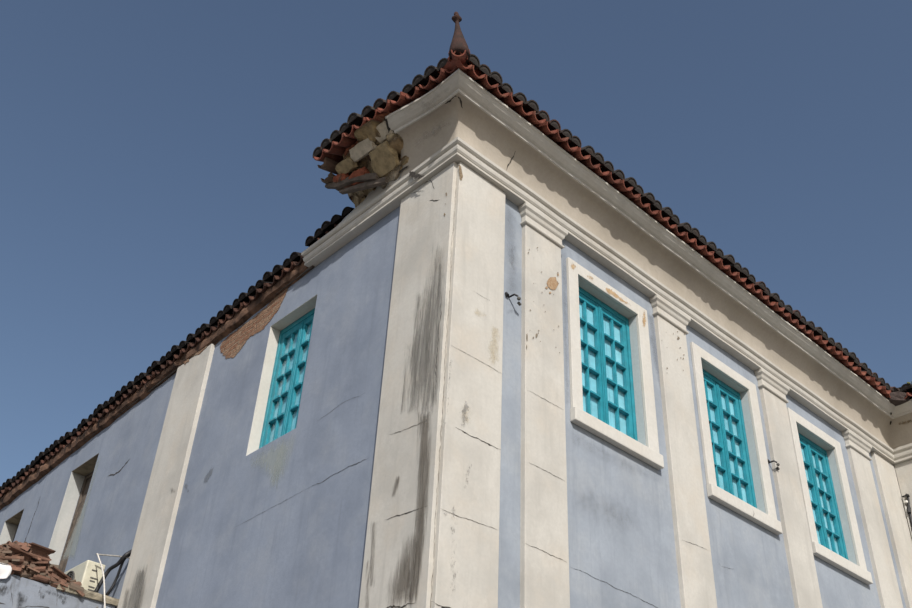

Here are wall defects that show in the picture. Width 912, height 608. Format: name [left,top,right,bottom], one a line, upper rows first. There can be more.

flaking render [333,111,409,208]
crack [399,165,457,201]
flaking render [183,288,288,364]
damp [412,269,441,401]
crack [386,272,502,545]
damp [393,415,429,603]
crack [387,575,451,608]